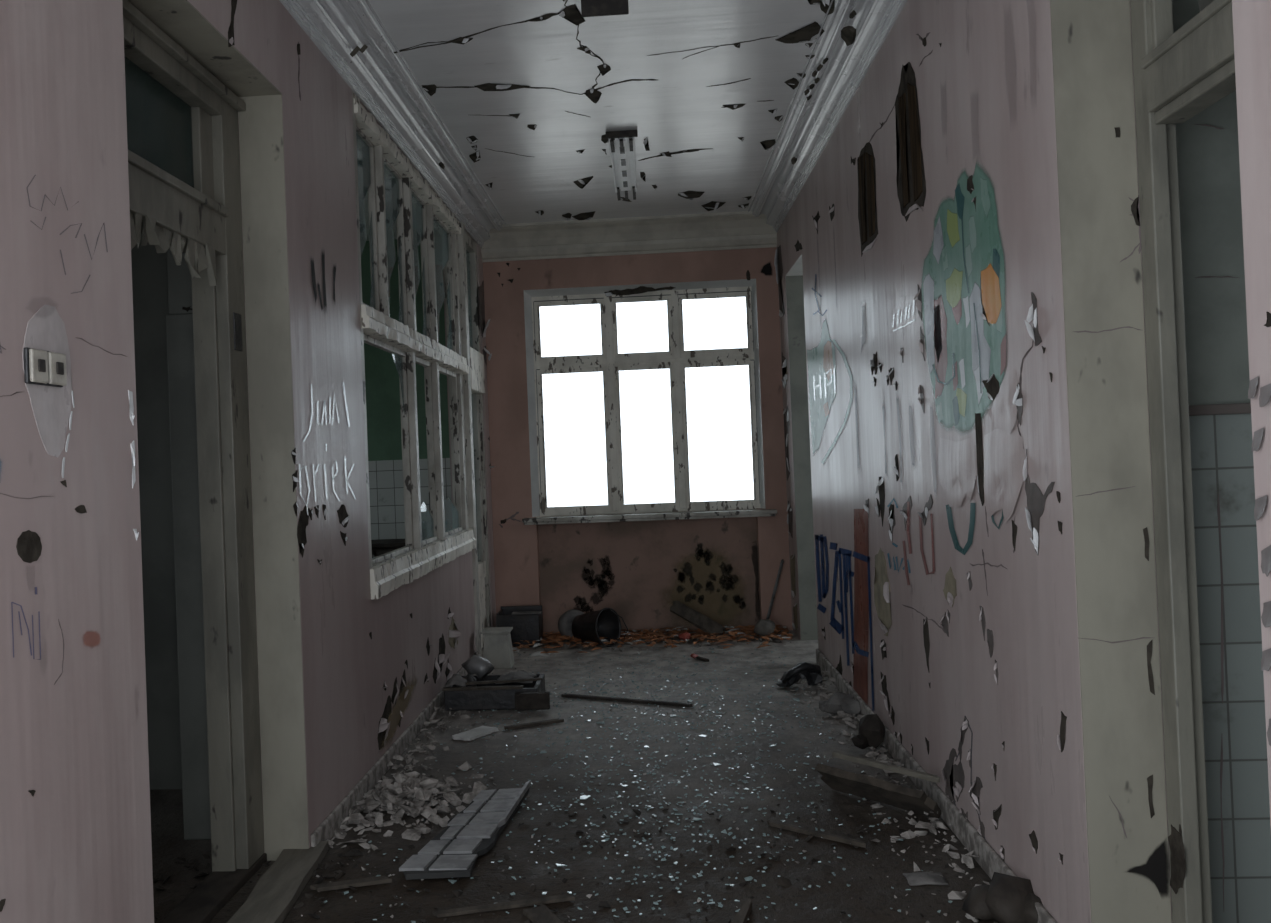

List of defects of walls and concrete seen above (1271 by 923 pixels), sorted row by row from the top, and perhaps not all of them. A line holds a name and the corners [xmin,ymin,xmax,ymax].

crack [393,0,776,157]
peeling [776,0,835,100]
crack [638,148,713,161]
crack [851,104,895,165]
peeling [22,305,75,487]
peeling [1248,376,1271,407]
mould [574,556,615,613]
damp [669,543,746,626]
peeling [1261,545,1271,577]
peeling [424,607,461,684]
peeling [377,660,408,750]
peeling [942,716,1002,840]